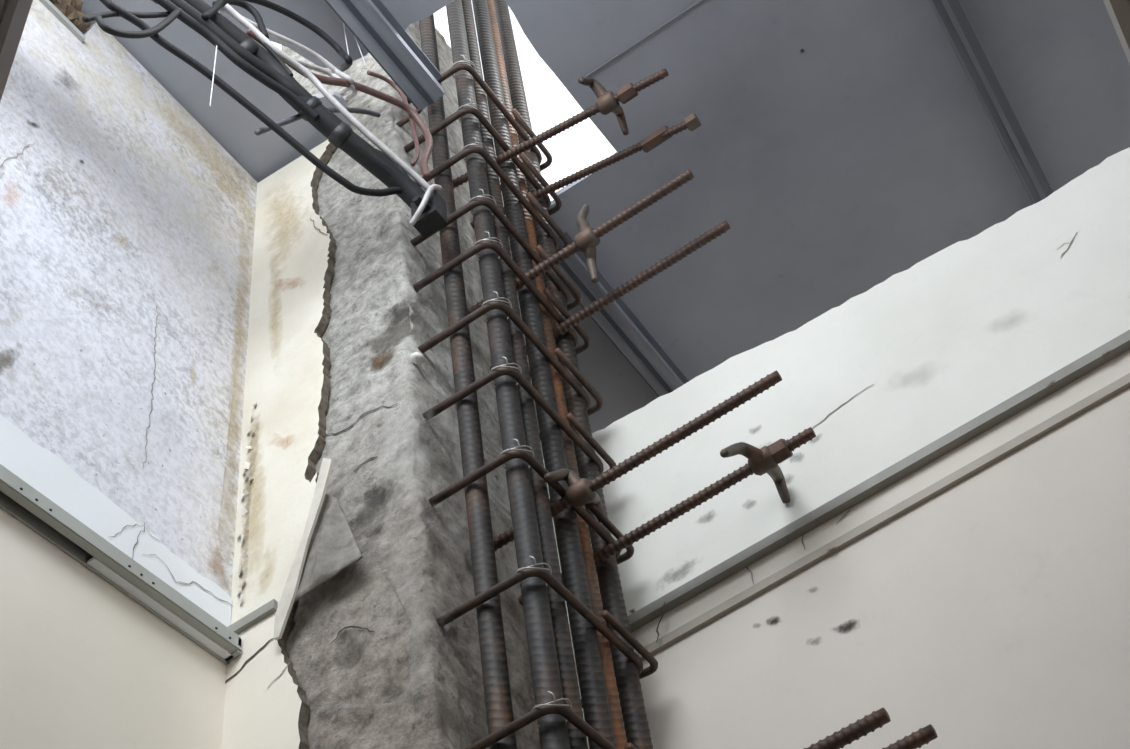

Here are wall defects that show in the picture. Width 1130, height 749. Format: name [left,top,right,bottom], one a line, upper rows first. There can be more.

crack [143,306,158,468]
spalling [366,0,653,749]
crack [812,384,874,429]
crack [111,523,231,605]